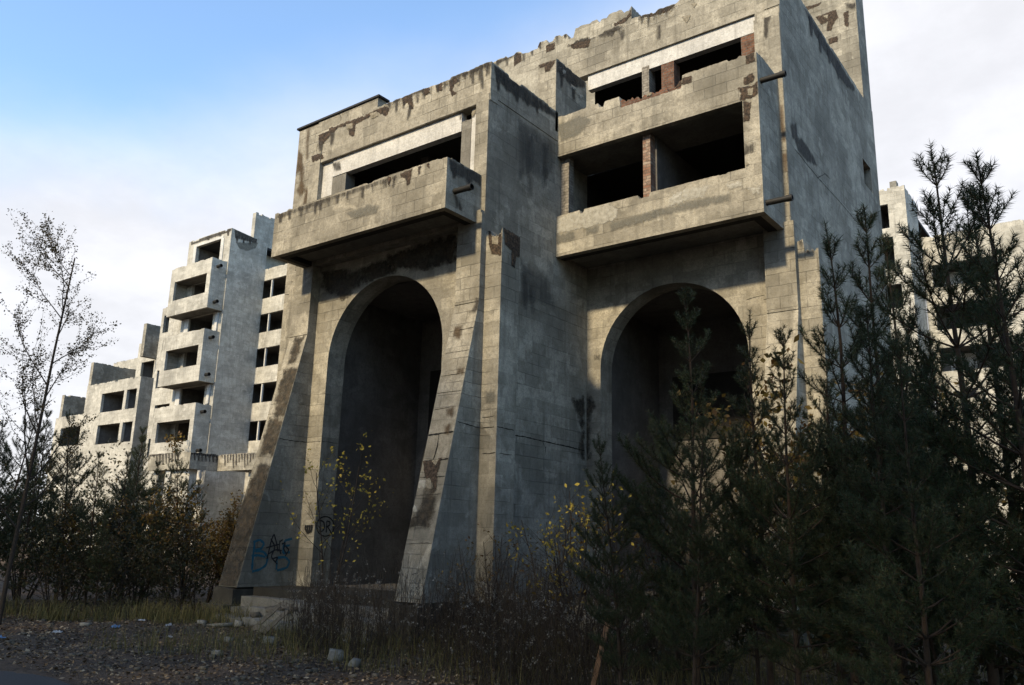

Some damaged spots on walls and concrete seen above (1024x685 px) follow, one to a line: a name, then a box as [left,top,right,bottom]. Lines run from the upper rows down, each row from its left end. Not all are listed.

spalling [538,5,674,99]
damp [805,9,855,91]
spalling [806,2,855,44]
spalling [402,77,460,118]
damp [387,44,590,141]
spalling [738,53,758,122]
spalling [312,106,389,170]
damp [791,123,816,165]
spalling [488,228,520,268]
damp [149,336,304,586]
crack [414,327,585,518]
damp [573,395,595,459]